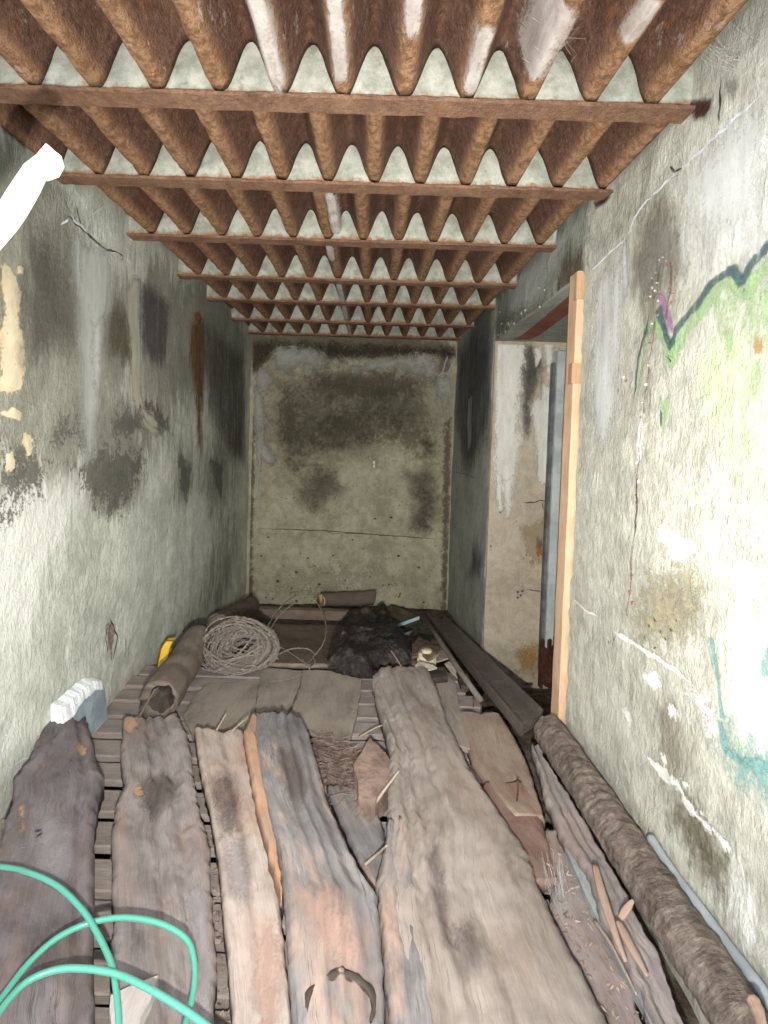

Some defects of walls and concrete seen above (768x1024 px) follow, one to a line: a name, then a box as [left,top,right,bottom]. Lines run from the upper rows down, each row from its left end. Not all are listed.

leakage [245,0,286,94]
crack [61,207,123,260]
leakage [323,192,342,234]
peeling [0,256,33,472]
leakage [0,233,173,530]
leakage [177,451,192,502]
corrosion [189,312,205,446]
leakage [206,284,554,518]
leakage [412,472,432,528]
crack [622,256,676,616]